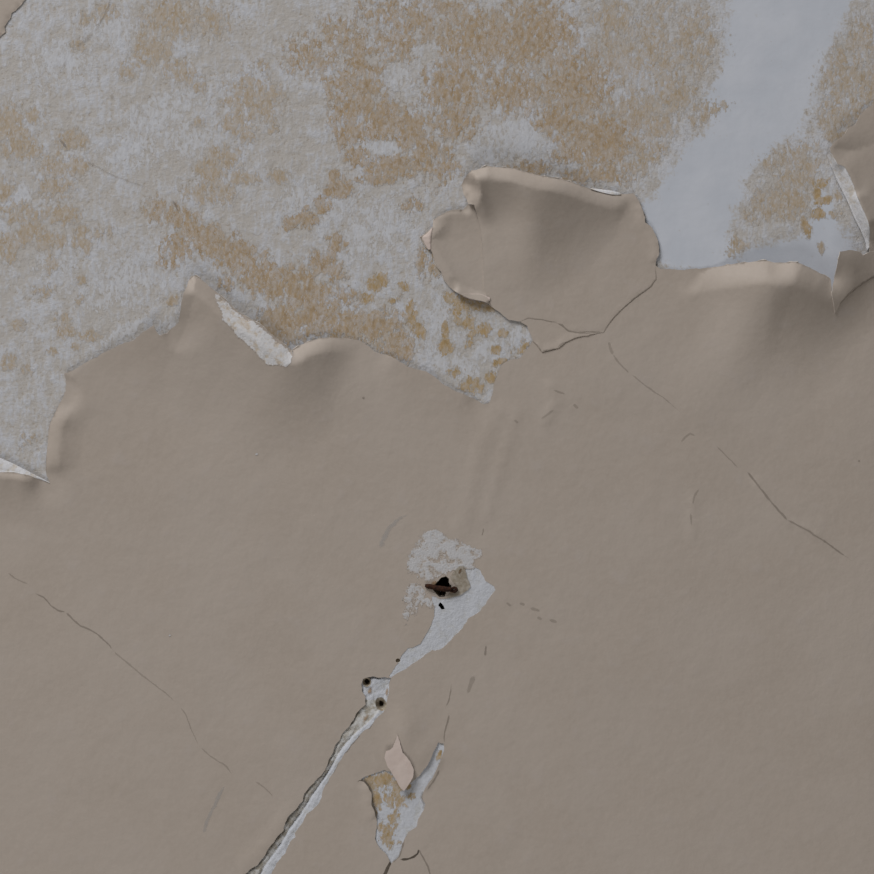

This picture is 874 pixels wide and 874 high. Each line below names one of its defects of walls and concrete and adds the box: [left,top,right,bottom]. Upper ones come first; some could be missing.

peeling [0,0,24,36]
peeling [180,275,382,398]
peeling [420,165,659,352]
peeling [709,104,874,334]
water stain [723,9,874,263]
peeling [0,396,89,530]
spalling [246,528,495,874]